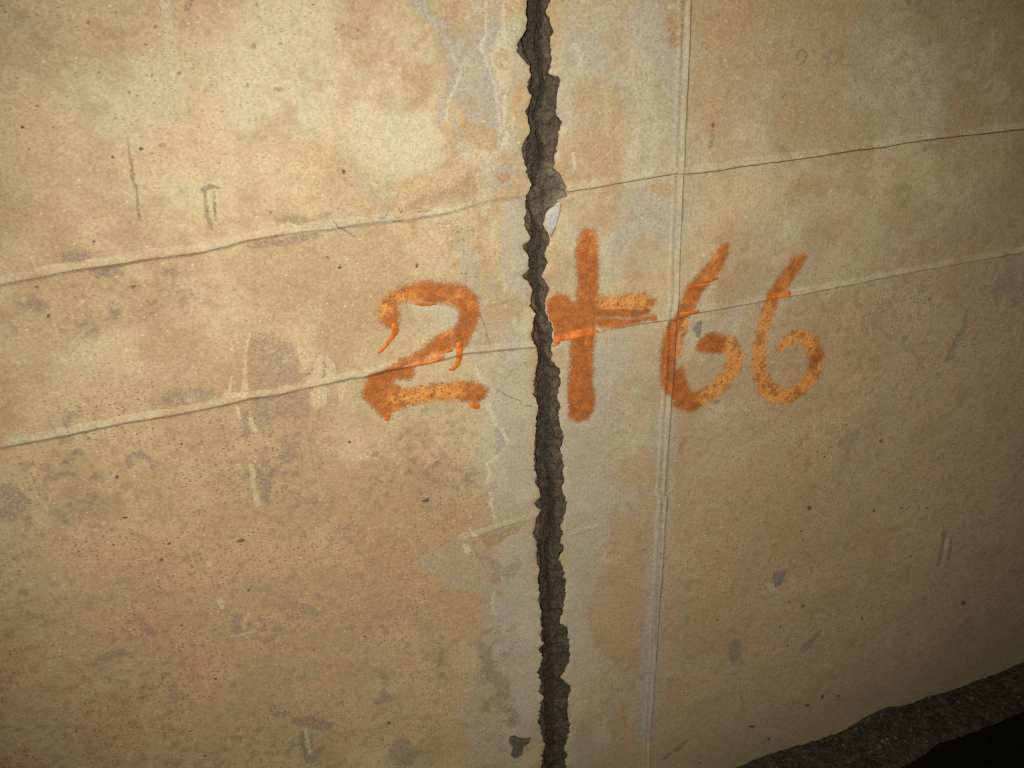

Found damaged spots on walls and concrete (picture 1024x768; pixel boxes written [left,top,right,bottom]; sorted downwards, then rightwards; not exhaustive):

crack [418,0,1024,768]